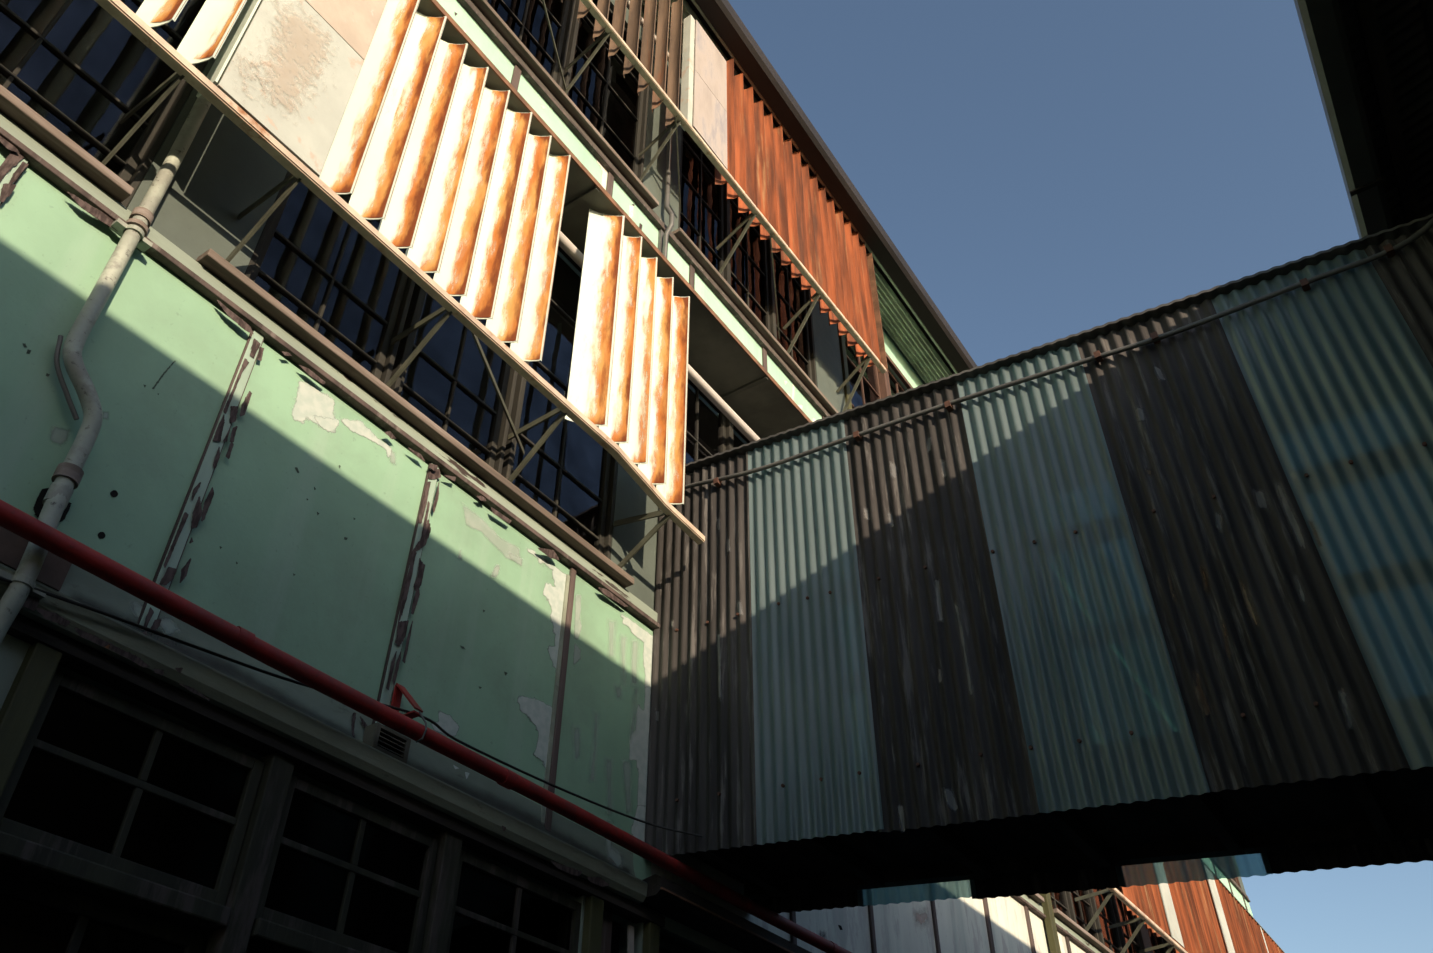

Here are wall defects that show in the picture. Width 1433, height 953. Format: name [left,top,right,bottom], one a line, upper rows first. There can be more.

rust [151,0,186,22]
rust [197,0,246,59]
peeling [0,135,29,203]
rust [331,0,571,360]
peeling [212,300,264,470]
rust [588,215,690,503]
peeling [160,482,214,585]
peeling [282,351,456,690]
peeling [463,495,582,668]
peeling [518,696,552,780]